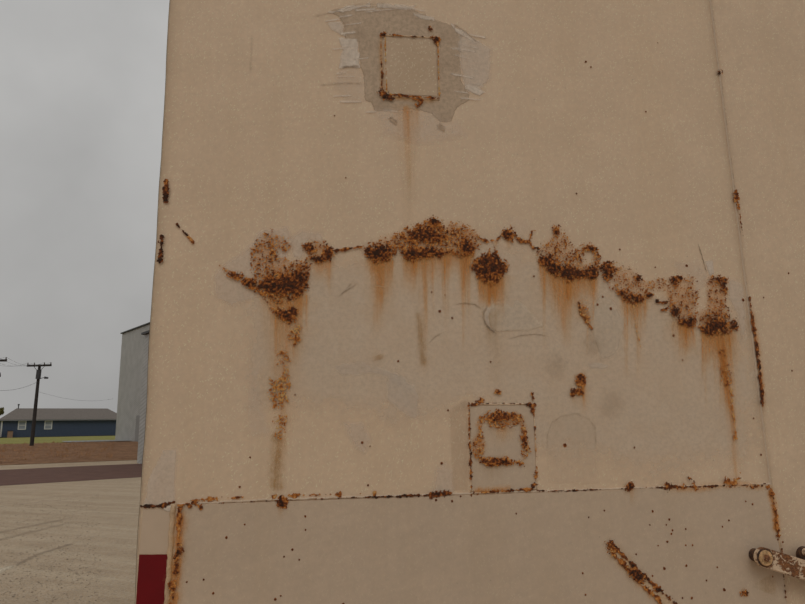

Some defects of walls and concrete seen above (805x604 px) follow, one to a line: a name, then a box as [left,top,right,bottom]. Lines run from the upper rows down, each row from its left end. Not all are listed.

peeling [326,3,489,122]
corrosion [377,26,441,108]
corrosion [219,215,739,440]
corrosion [742,296,764,407]
corrosion [266,389,601,509]
corrosion [167,486,255,604]
corrosion [606,540,693,604]
corrosion [646,472,784,553]